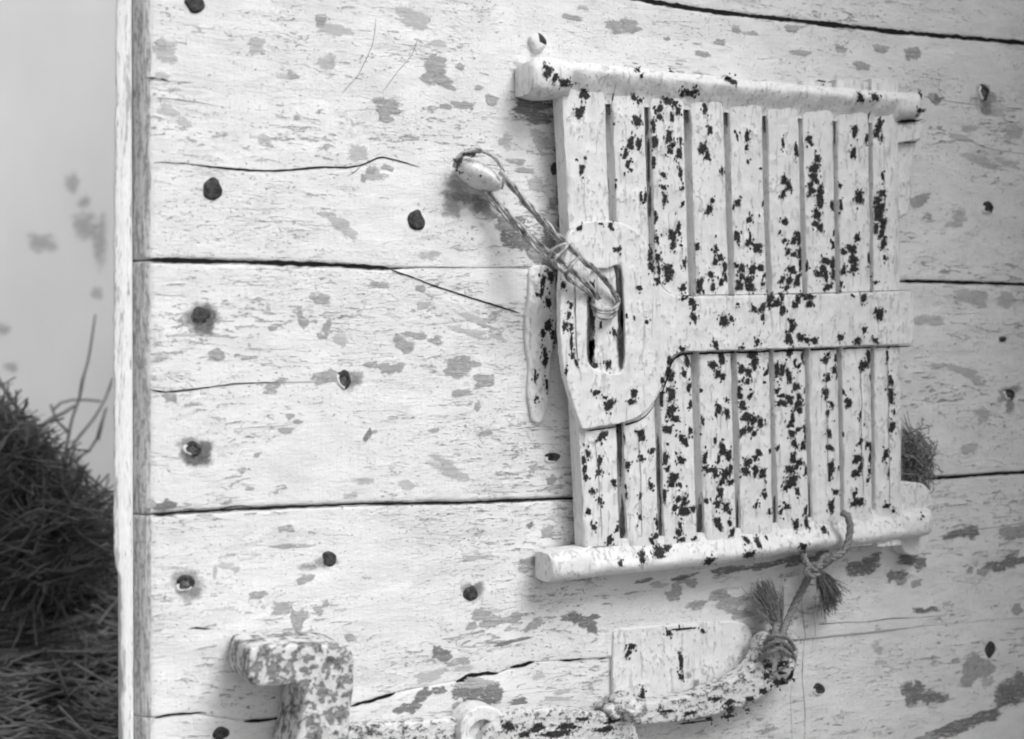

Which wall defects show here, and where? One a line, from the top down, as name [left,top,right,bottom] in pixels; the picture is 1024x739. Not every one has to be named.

peeling [419,39,556,153]
crack [155,157,419,176]
crack [149,257,532,313]
peeling [363,309,507,374]
crack [150,382,282,393]
peeling [443,355,495,411]
peeling [466,608,543,646]
peeling [560,611,601,636]
crack [456,658,606,682]
crack [155,711,205,719]
crack [351,692,396,707]
peeling [915,652,1024,739]